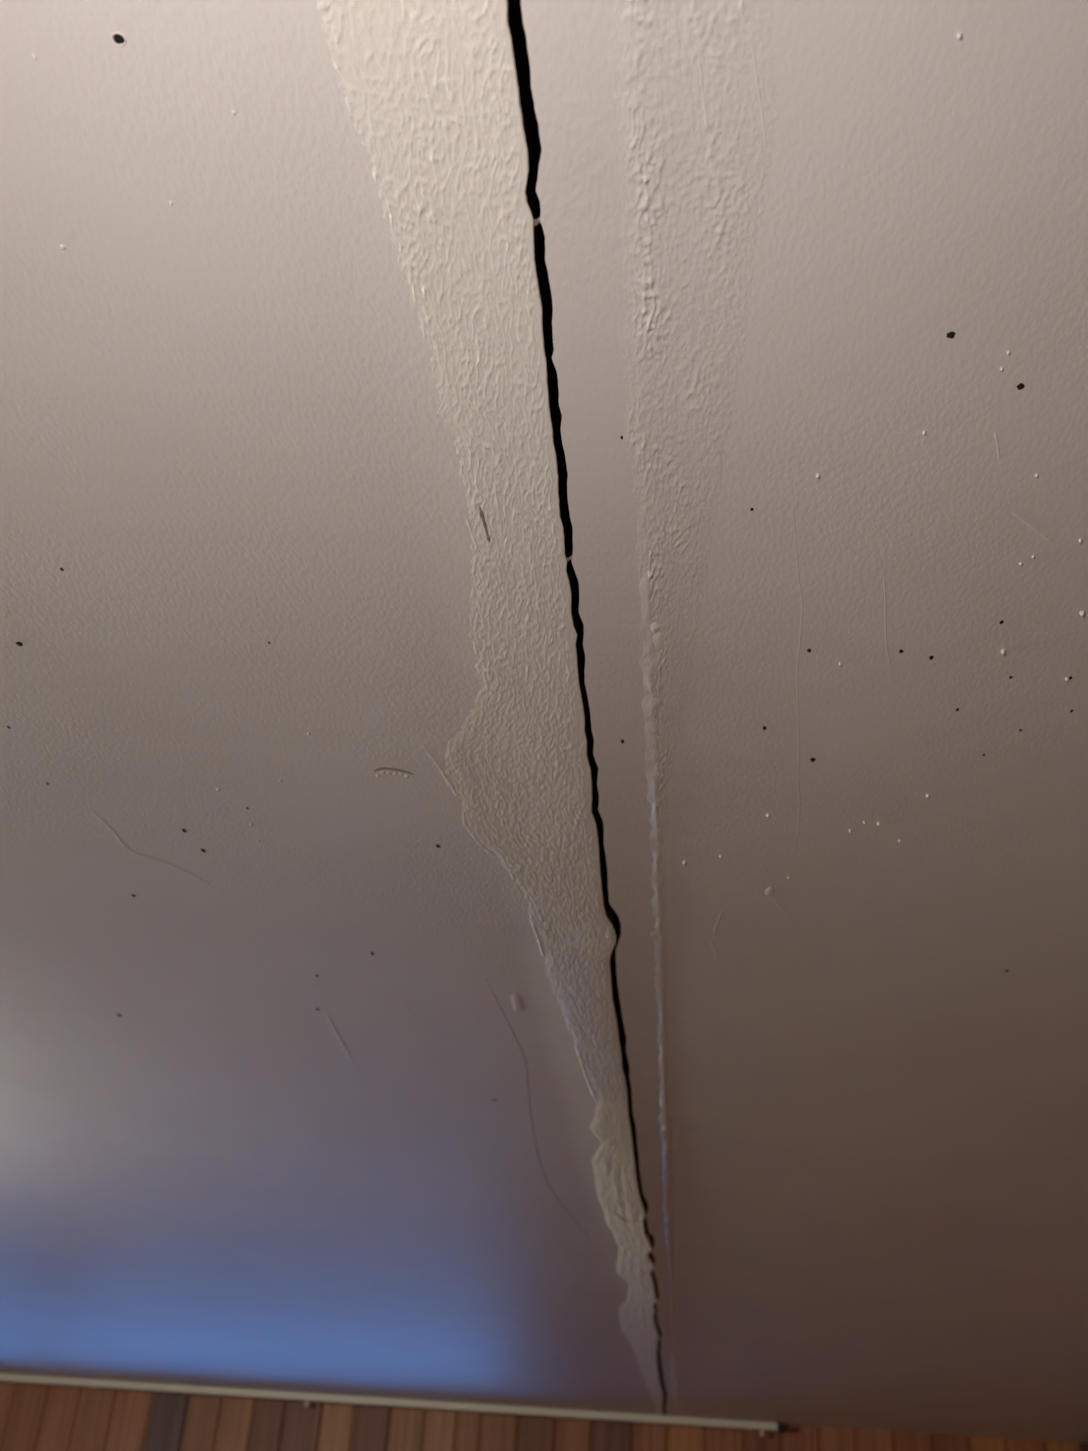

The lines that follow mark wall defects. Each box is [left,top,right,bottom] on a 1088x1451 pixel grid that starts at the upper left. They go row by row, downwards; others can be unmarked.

crack [507,0,667,1415]